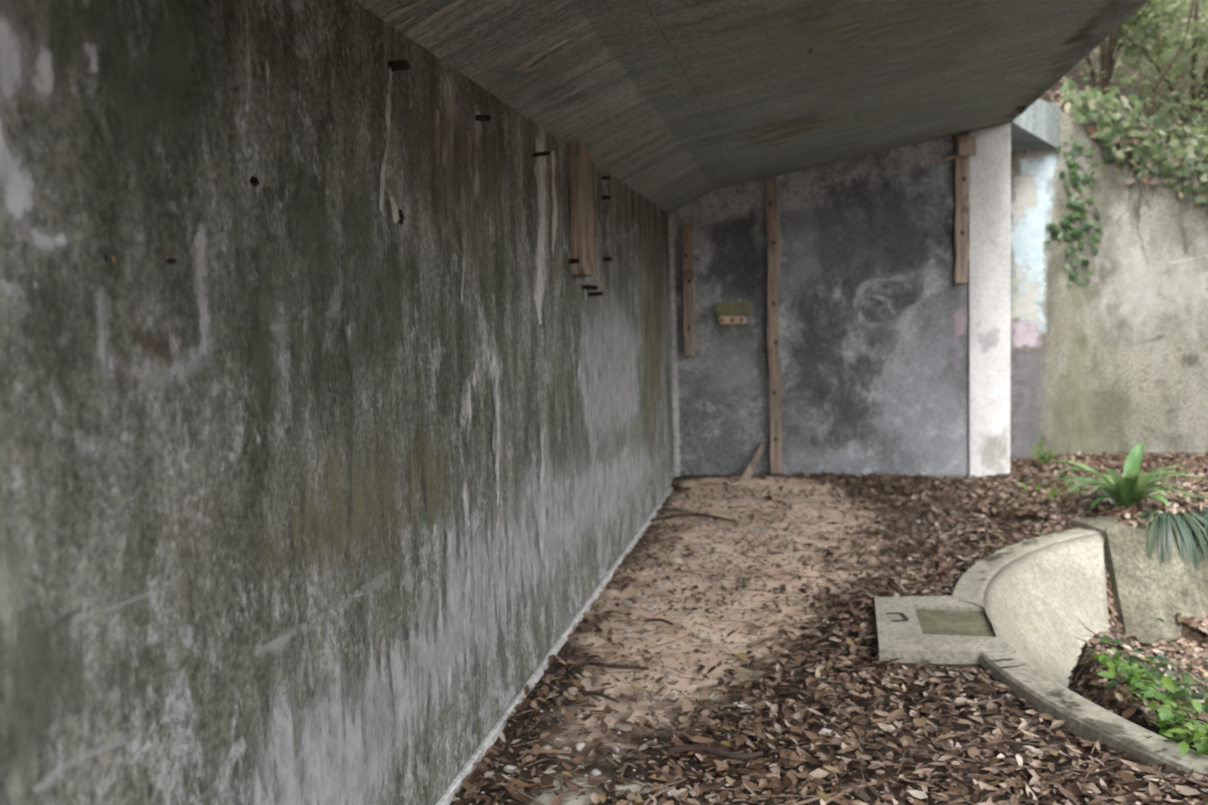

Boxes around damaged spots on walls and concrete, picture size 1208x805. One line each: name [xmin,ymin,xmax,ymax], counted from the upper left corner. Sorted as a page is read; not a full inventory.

leakage [379,67,399,223]
leakage [785,168,965,469]